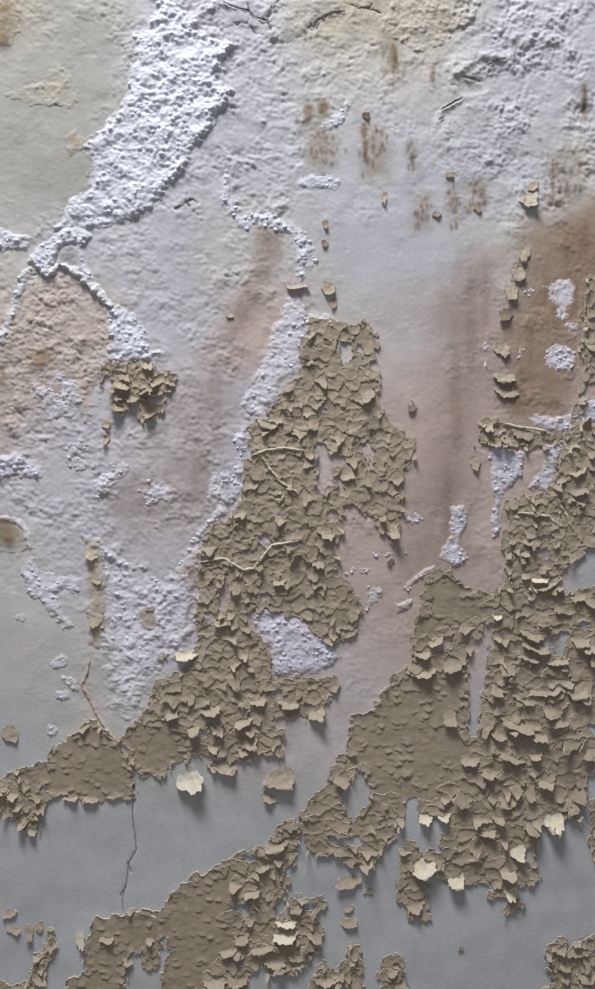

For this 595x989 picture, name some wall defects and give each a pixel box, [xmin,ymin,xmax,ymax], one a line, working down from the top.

water stain [0,0,236,365]
water stain [218,173,342,416]
water stain [513,273,579,374]
water stain [29,367,85,423]
water stain [58,437,130,501]
water stain [20,556,83,629]
water stain [49,654,80,701]
water stain [99,429,247,732]
peeling [0,257,417,837]
water stain [247,608,342,678]
peeling [64,273,595,989]
crack [121,775,137,905]